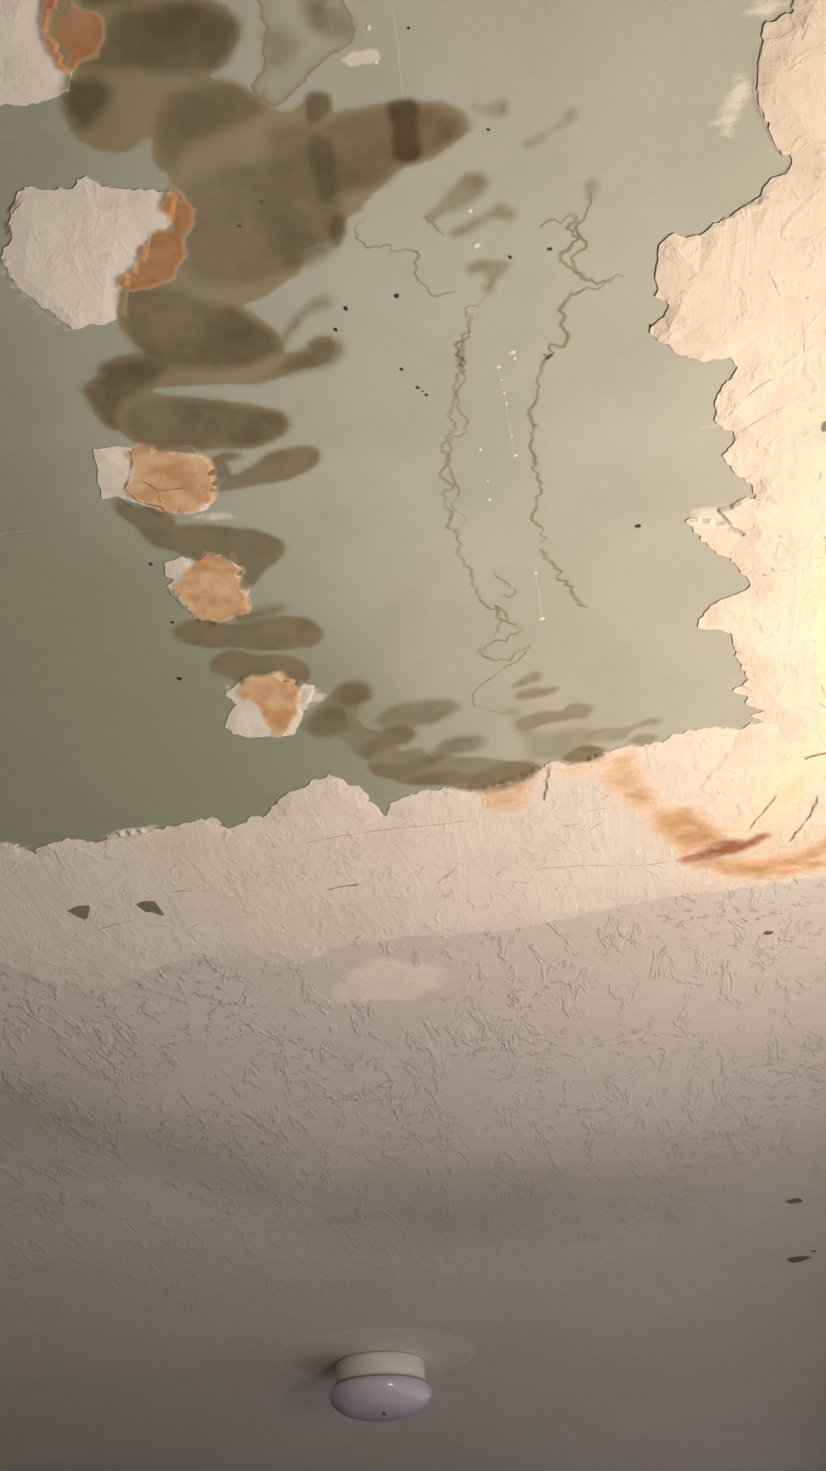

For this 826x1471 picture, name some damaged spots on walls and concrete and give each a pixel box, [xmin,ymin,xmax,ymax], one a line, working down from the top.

water stain [427,176,483,227]
water stain [49,0,468,491]
water stain [114,500,285,590]
water stain [171,607,323,687]
water stain [517,674,591,730]
water stain [302,684,541,791]
water stain [562,746,606,762]
corrosion [610,757,826,878]
crack [750,795,777,829]
crack [790,796,818,841]
spalling [68,905,90,936]
spalling [137,901,164,916]